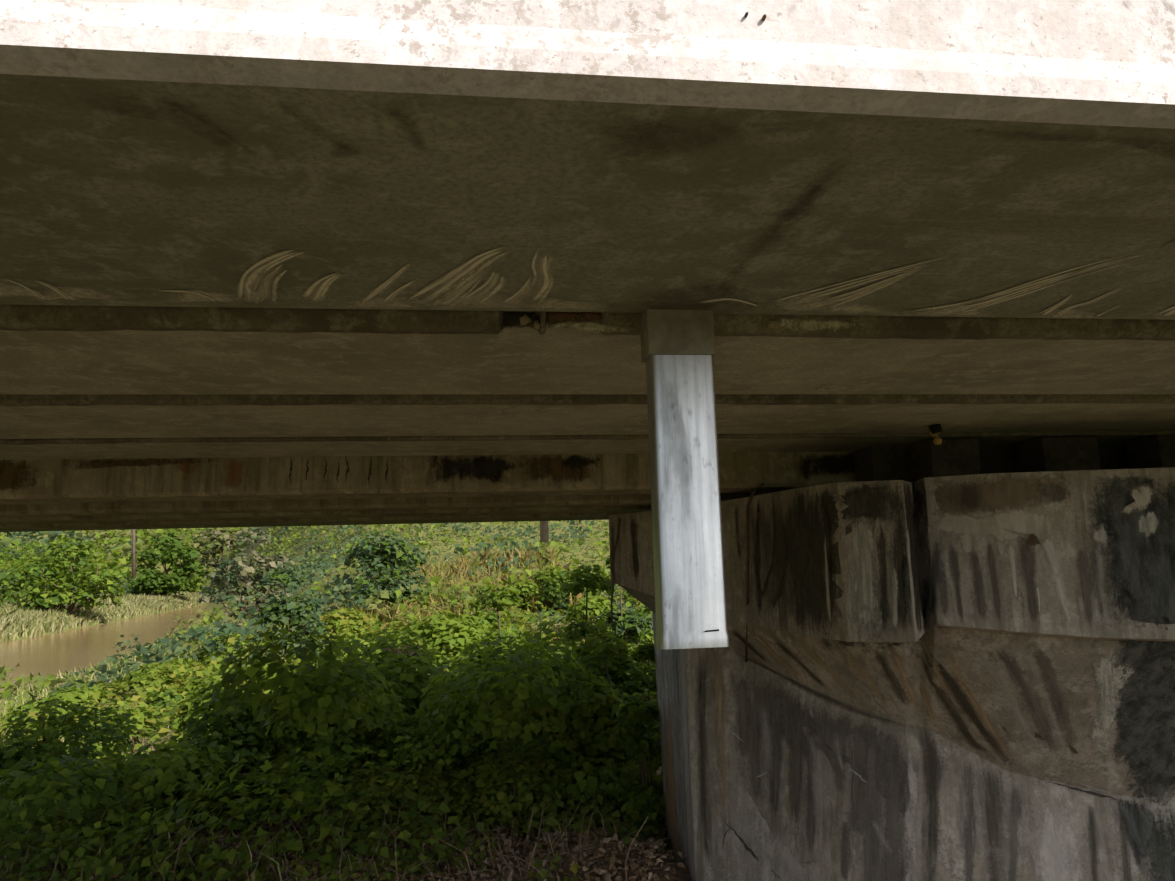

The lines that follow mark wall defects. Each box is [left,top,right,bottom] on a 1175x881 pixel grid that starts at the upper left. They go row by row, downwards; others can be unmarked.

spalling [501,311,623,332]
water stain [799,453,855,479]
water stain [753,477,1072,632]
water stain [697,632,940,881]
water stain [877,652,1010,759]
water stain [978,651,1073,749]
water stain [964,765,1021,881]
water stain [1089,809,1098,881]